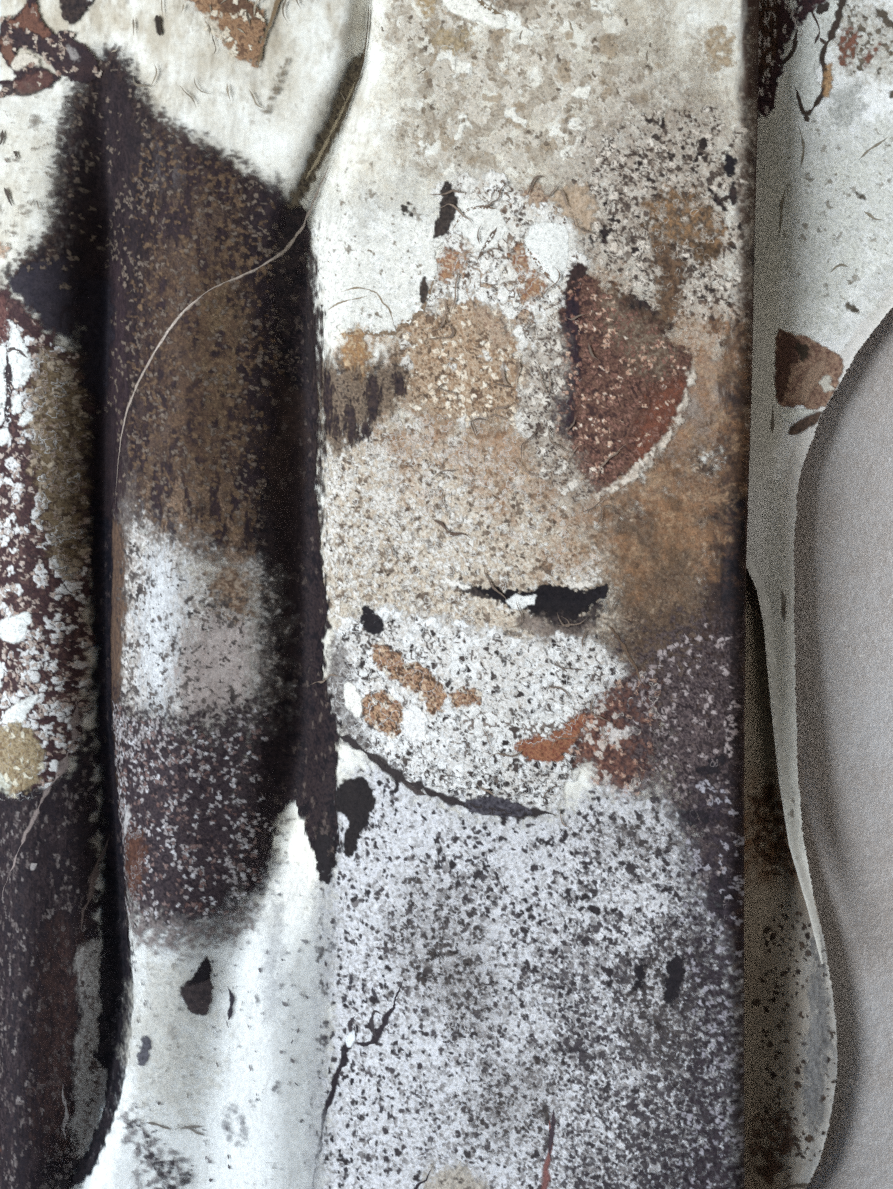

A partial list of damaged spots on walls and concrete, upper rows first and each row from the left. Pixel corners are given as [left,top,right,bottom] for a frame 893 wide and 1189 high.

crack [431,175,603,244]
leakage [708,154,737,211]
crack [422,272,495,339]
spalling [311,0,893,647]
crack [431,355,578,477]
crack [428,469,471,539]
crack [581,444,626,527]
leakage [0,43,411,1189]
crack [548,596,644,748]
crack [339,727,571,831]
leakage [516,312,797,1189]
crack [312,981,403,1187]